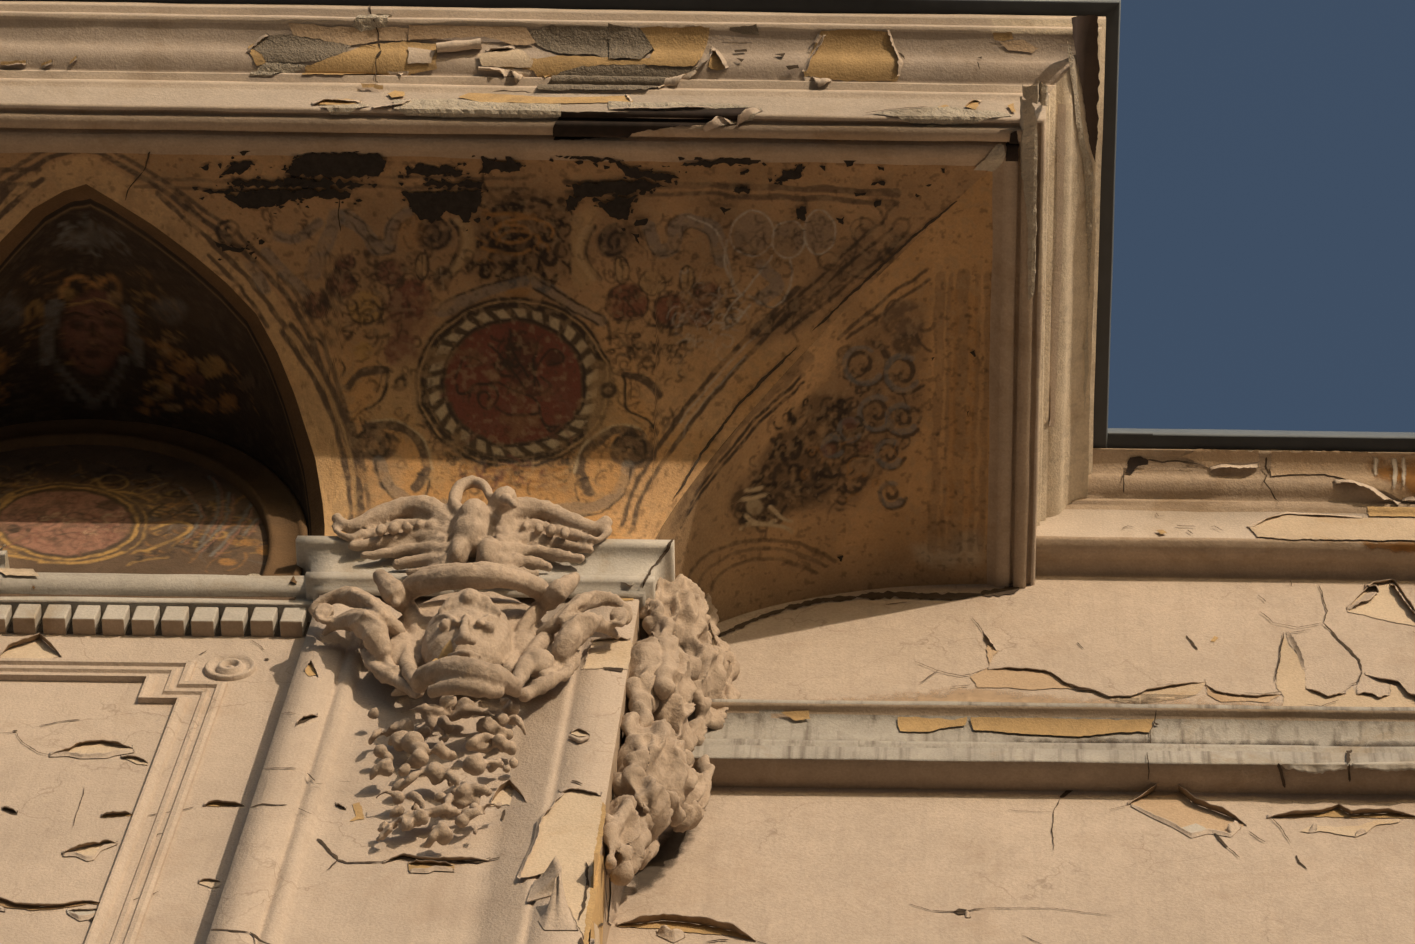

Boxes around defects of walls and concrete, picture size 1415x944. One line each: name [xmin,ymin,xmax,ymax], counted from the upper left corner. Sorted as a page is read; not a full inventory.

spalling [775,29,905,87]
spalling [246,14,825,243]
peeling [192,151,526,231]
spalling [1247,507,1415,552]
peeling [898,579,1415,736]
peeling [49,739,149,765]
peeling [568,728,591,743]
peeling [62,839,118,862]
peeling [490,779,527,820]
spalling [517,780,756,944]
peeling [1113,783,1266,857]
peeling [1267,803,1415,843]